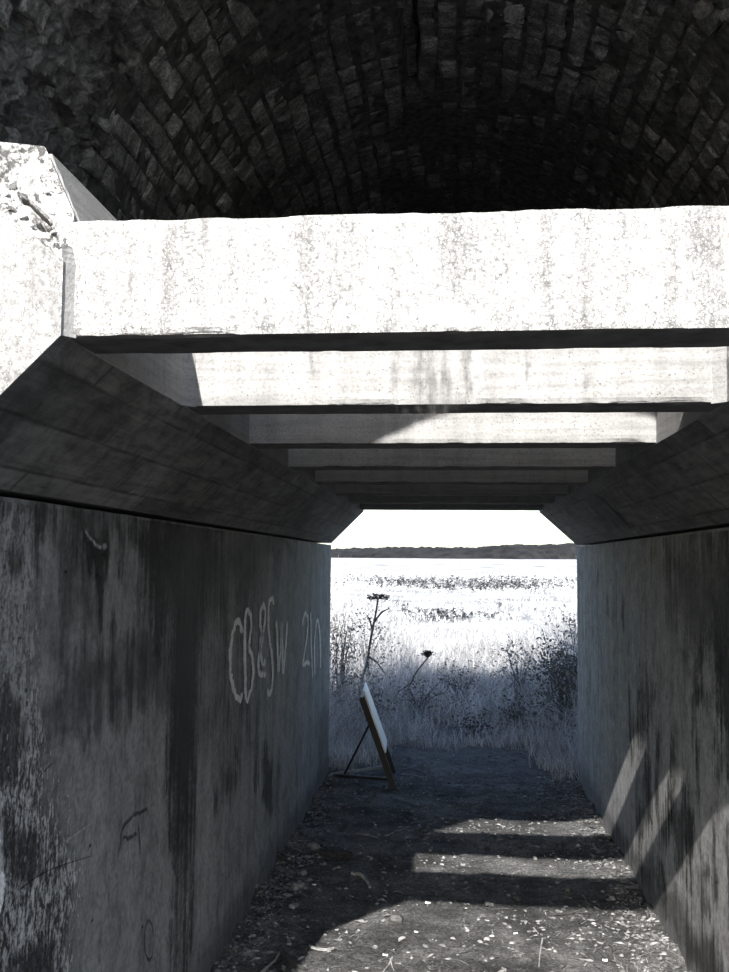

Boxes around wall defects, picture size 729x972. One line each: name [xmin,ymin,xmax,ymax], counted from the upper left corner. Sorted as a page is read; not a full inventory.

spalling [0,0,161,264]
damp [18,502,298,972]
damp [623,530,729,972]